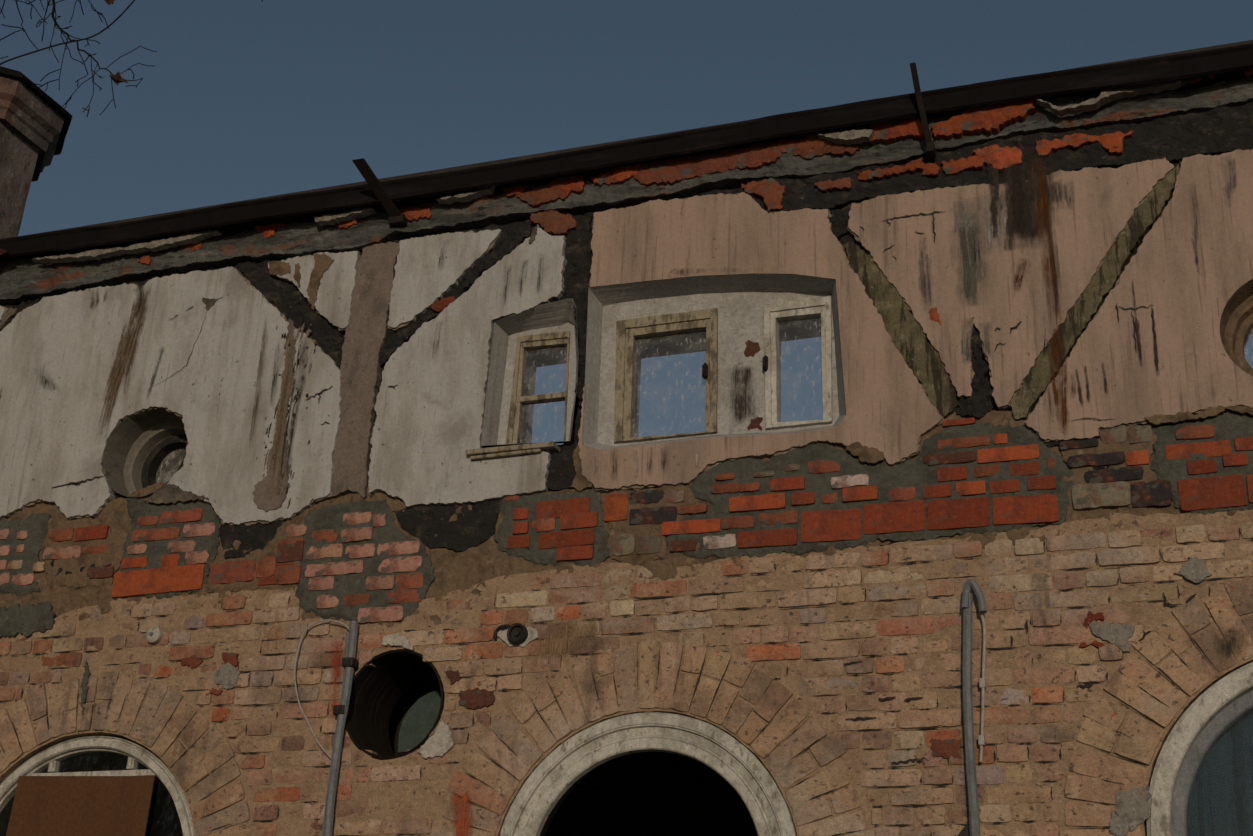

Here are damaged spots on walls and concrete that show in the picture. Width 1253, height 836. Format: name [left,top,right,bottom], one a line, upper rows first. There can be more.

spalling [399,206,432,222]
spalling [503,98,1134,244]
damp [955,191,1012,298]
spalling [744,340,761,357]
flaking render [0,253,435,625]
flaking render [493,405,1253,567]